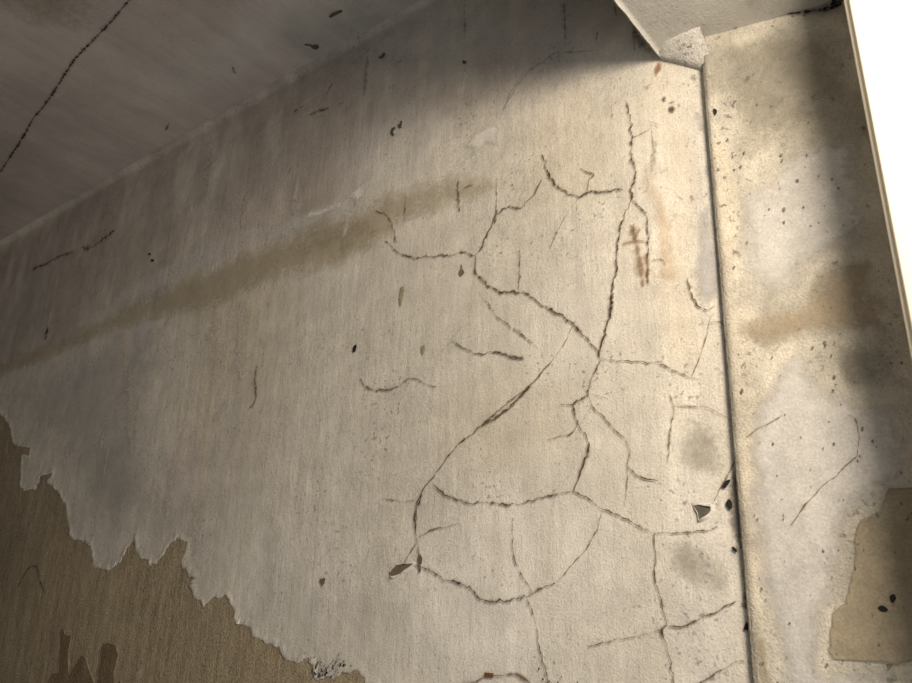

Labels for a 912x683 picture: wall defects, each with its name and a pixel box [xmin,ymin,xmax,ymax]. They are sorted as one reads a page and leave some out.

crack [0,0,130,172]
crack [32,230,115,270]
damp [0,187,480,374]
rust [623,224,650,286]
damp [743,265,887,358]
crack [360,378,437,392]
crack [376,104,736,683]
crack [791,419,859,525]
peeling [0,405,383,683]
spalling [389,555,422,580]
peeling [829,488,912,665]